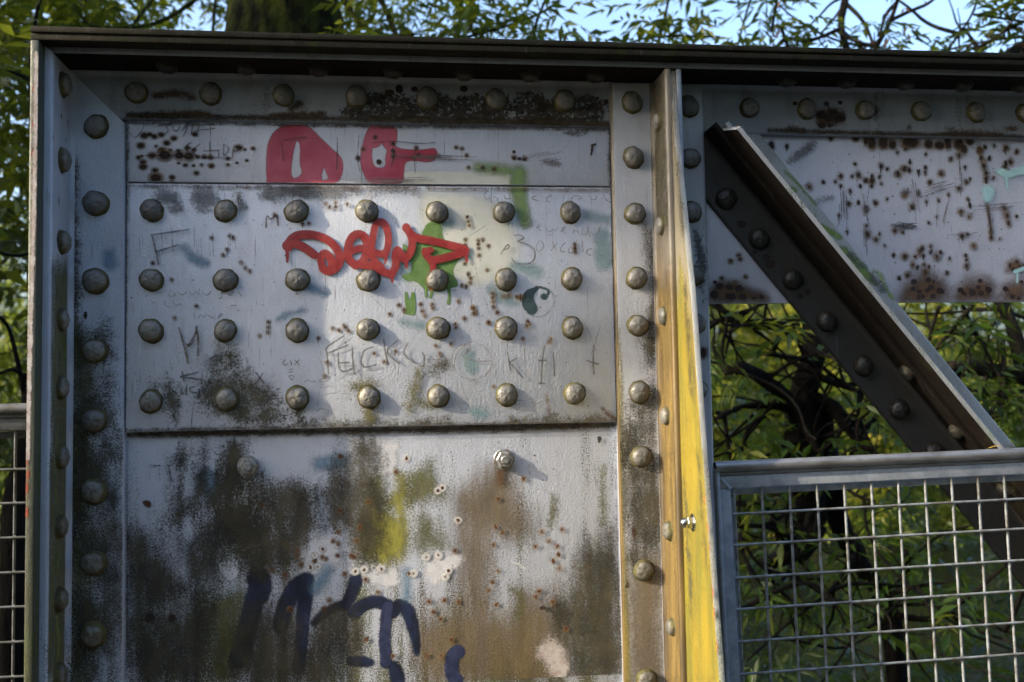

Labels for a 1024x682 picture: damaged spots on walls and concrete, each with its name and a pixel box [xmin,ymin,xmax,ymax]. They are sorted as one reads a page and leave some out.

rust [806,126,1024,302]
rust [454,262,523,329]
rust [710,275,769,303]
water stain [61,162,452,682]
rust [295,525,385,594]
rust [407,549,457,581]
water stain [418,385,664,682]
rust [533,527,564,571]